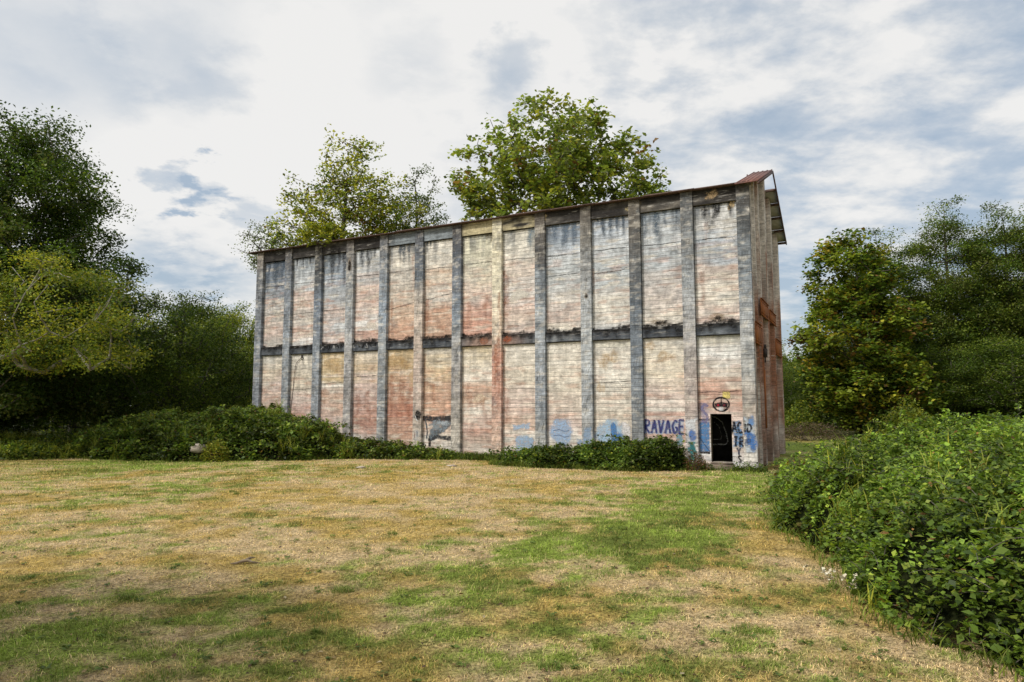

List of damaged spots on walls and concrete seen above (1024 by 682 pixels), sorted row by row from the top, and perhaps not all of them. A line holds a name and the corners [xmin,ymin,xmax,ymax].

leakage [700,202,731,223]